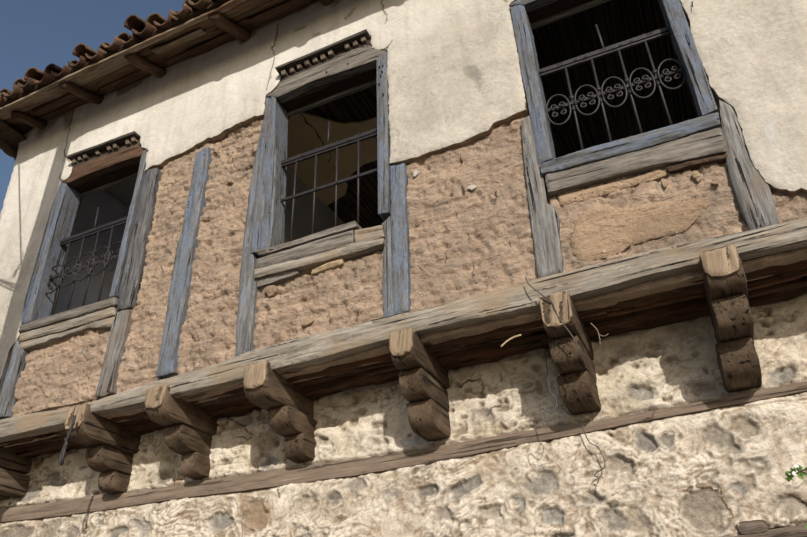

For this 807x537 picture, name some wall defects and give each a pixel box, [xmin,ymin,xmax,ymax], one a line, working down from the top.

spalling [116,119,264,394]
spalling [253,251,384,350]
spalling [405,107,538,311]
spalling [549,162,749,272]
spalling [770,189,807,223]
spalling [4,329,111,419]